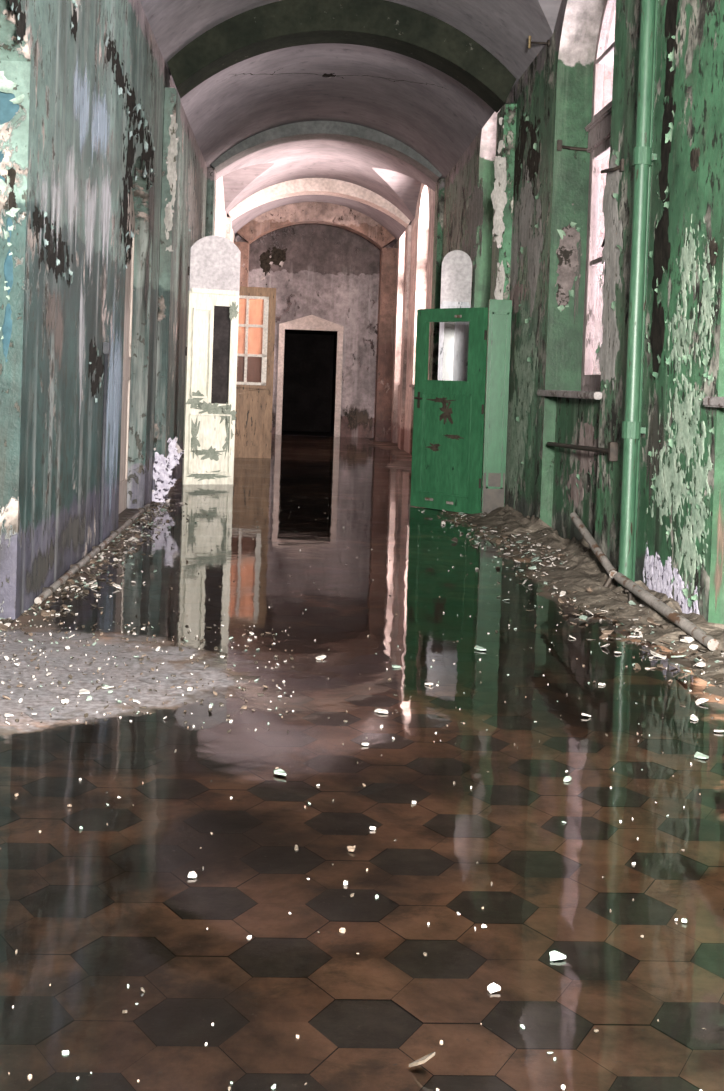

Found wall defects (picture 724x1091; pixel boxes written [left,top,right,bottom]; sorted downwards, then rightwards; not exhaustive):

peeling [70,0,81,41]
peeling [0,71,25,129]
peeling [105,32,200,269]
peeling [0,151,20,362]
peeling [30,206,73,286]
flaking render [555,222,582,311]
peeling [642,0,718,615]
peeling [152,390,237,503]